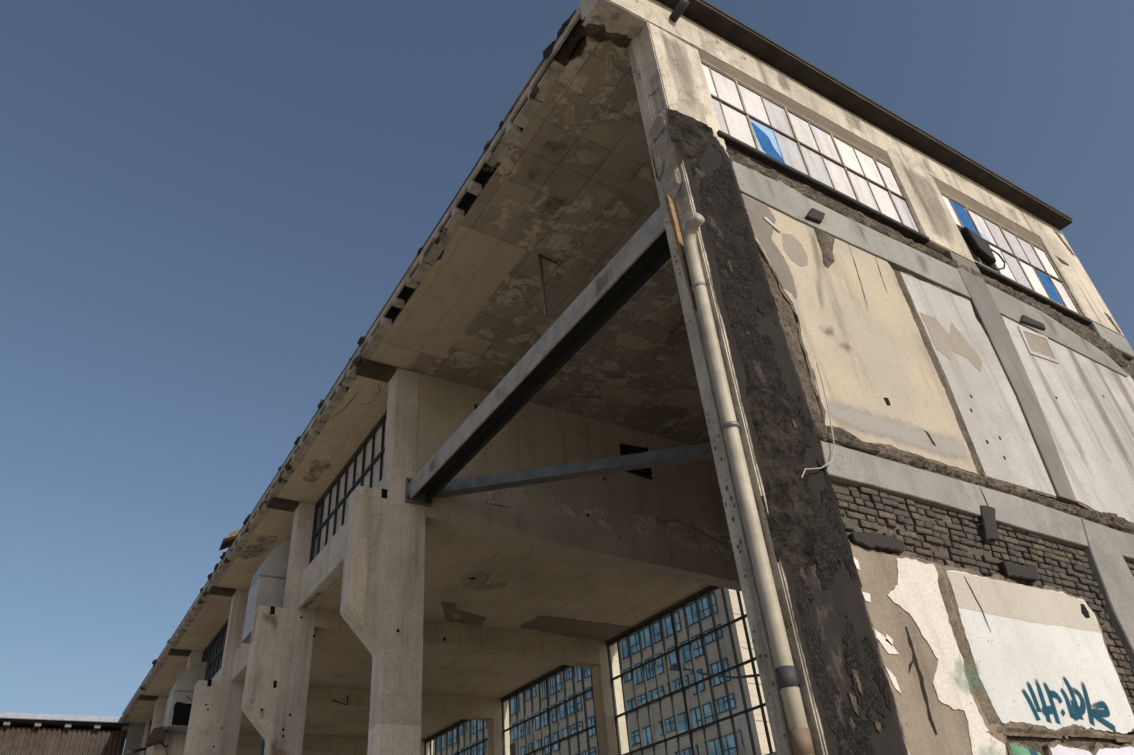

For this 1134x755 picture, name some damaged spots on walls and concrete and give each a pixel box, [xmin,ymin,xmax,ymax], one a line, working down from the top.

spalling [549,17,632,71]
spalling [650,107,682,201]
peeling [847,668,863,717]
peeling [874,629,901,694]
crack [905,626,937,735]
peeling [887,558,1006,755]